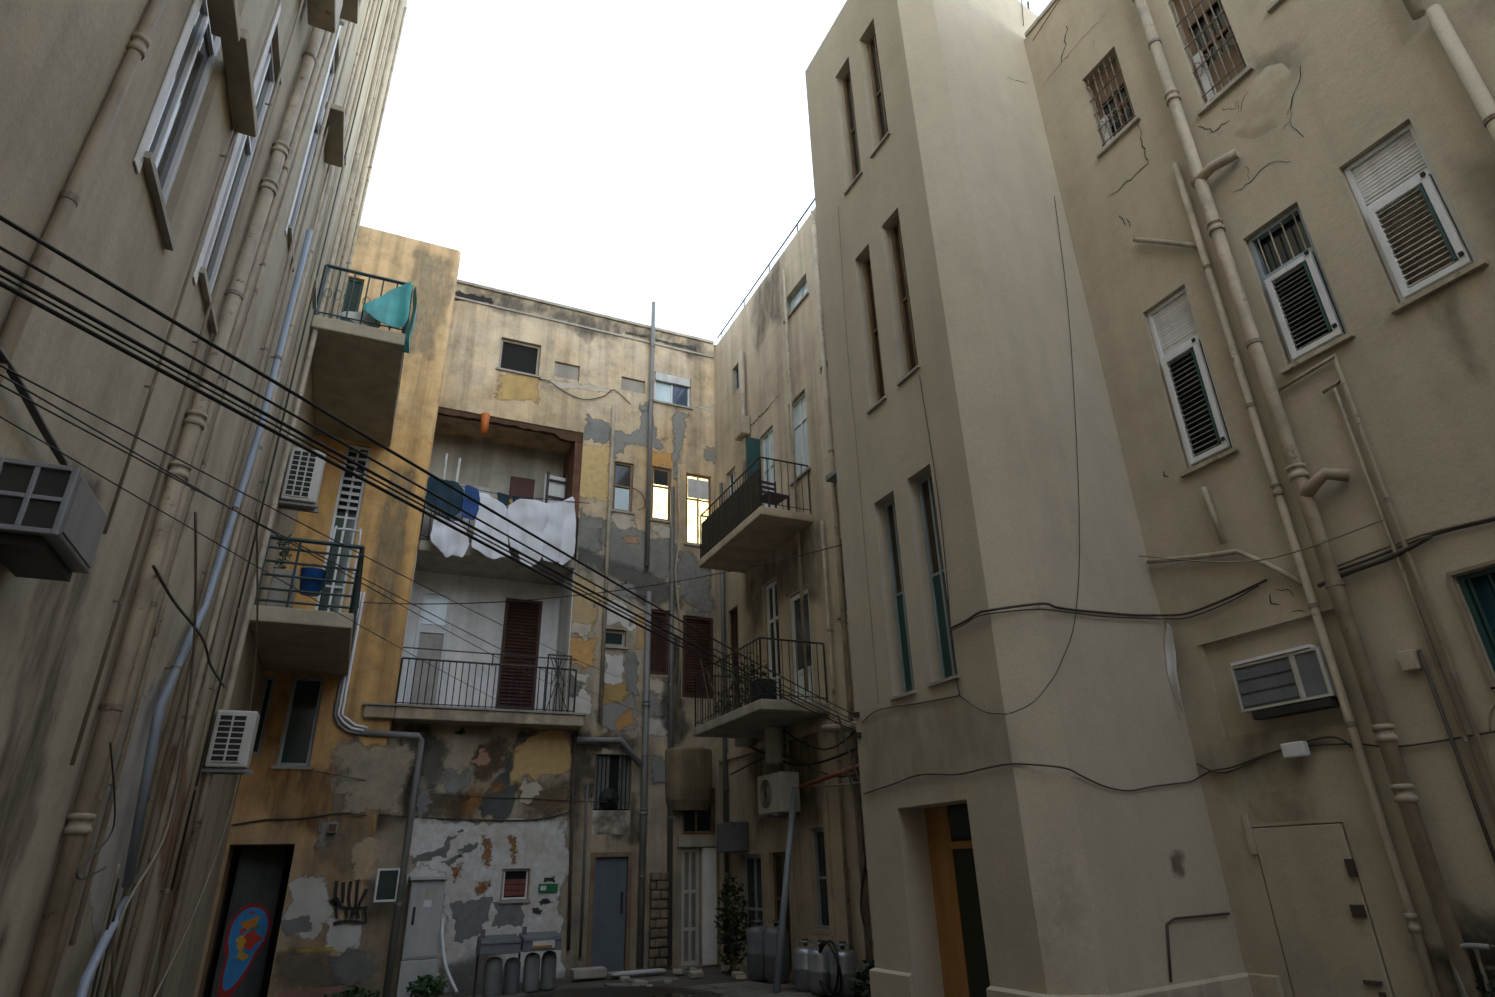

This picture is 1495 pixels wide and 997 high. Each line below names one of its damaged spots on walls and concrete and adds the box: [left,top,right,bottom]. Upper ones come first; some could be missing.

crack [1007,19,1101,83]
crack [1109,123,1148,196]
crack [1198,93,1247,134]
crack [1234,65,1304,192]
peeling [494,373,612,404]
peeling [567,402,689,754]
peeling [314,729,574,993]
peeling [281,874,379,988]